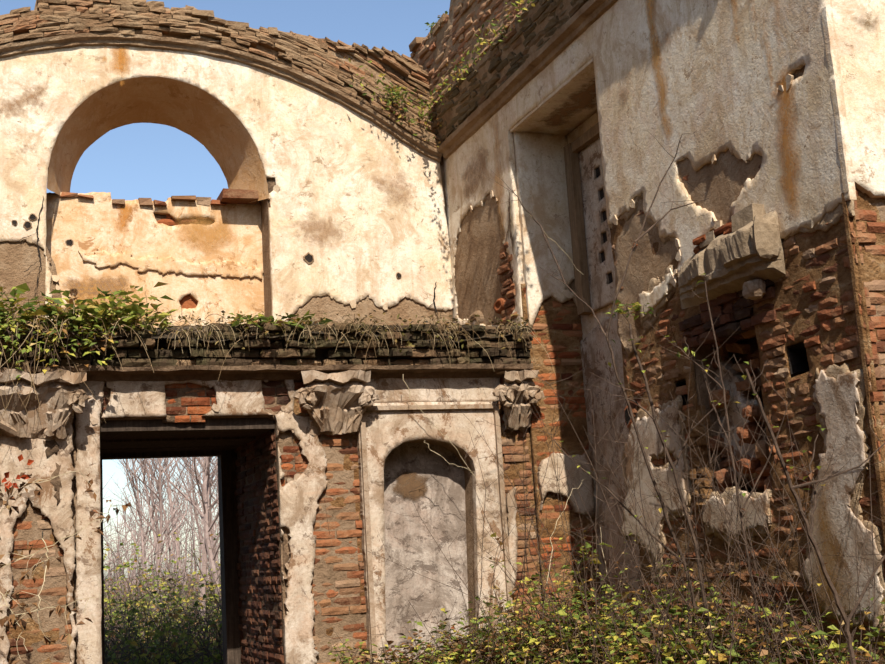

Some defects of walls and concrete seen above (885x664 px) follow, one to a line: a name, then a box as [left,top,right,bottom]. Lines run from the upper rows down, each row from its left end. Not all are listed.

flaking render [678,149,763,232]
crack [16,197,44,297]
flaking render [0,236,62,325]
flaking render [179,294,198,309]
flaking render [43,439,62,505]
flaking render [162,383,220,423]
flaking render [280,430,308,487]
flaking render [291,190,602,664]
flaking render [607,187,885,664]
flaking render [5,507,75,664]